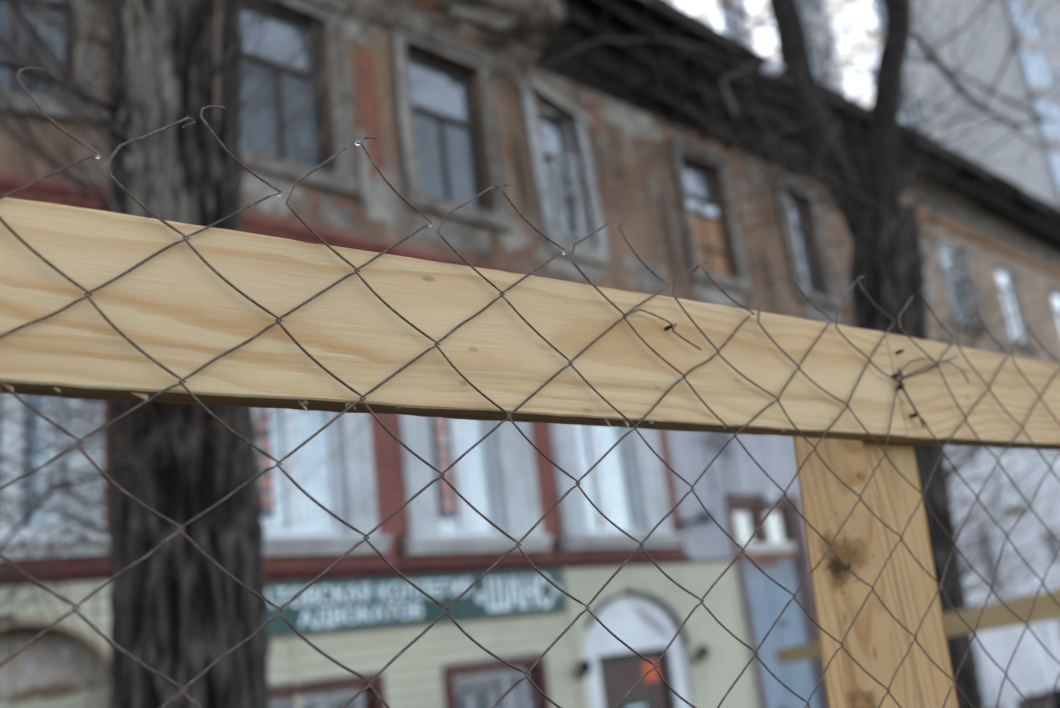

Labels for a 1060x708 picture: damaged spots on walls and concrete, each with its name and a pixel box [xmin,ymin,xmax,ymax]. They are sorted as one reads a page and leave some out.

flaking render [414,0,519,31]
flaking render [242,32,604,283]